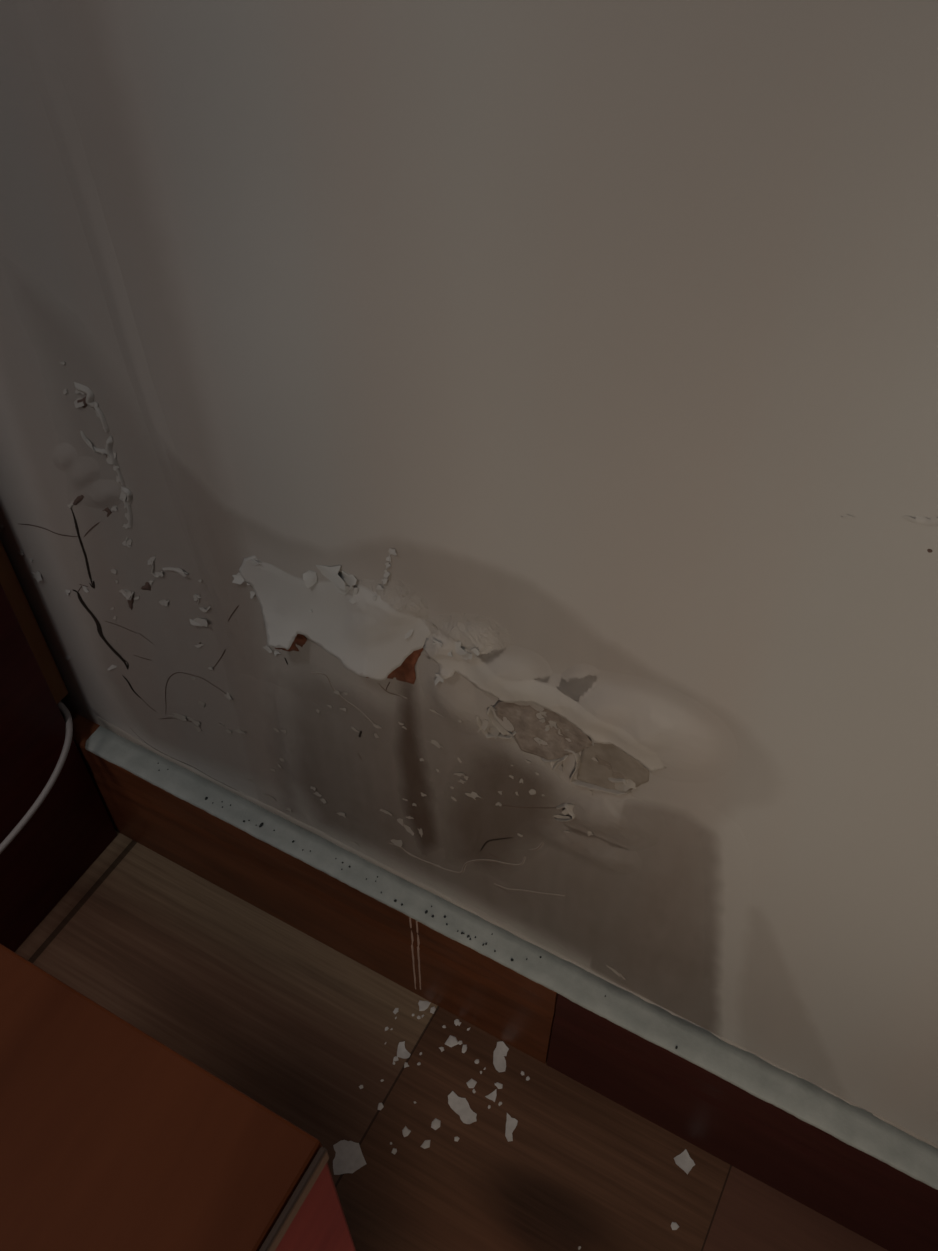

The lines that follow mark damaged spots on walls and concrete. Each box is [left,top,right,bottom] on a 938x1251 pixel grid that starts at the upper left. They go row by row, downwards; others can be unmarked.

peeling [63,382,133,548]
crack [21,508,239,722]
peeling [110,557,211,627]
peeling [232,548,666,806]